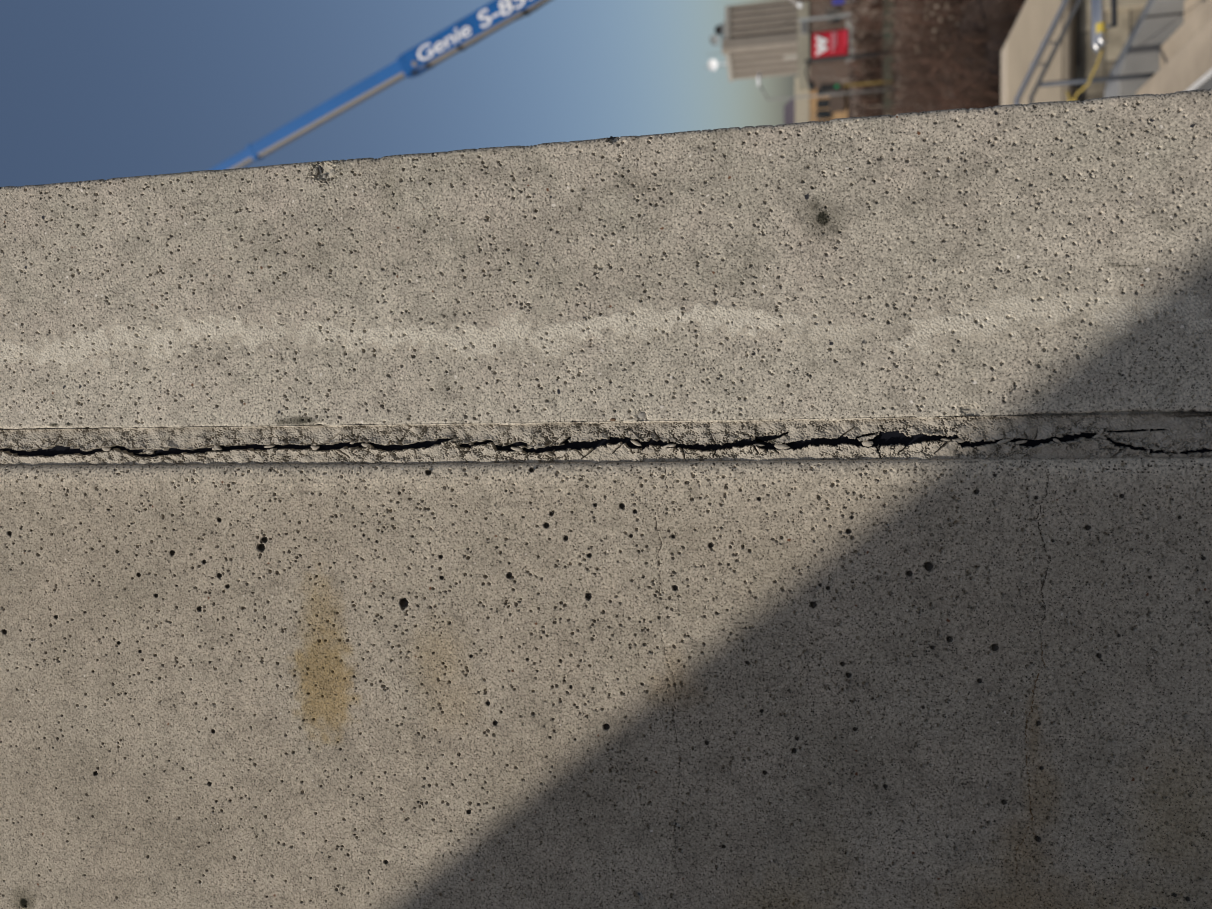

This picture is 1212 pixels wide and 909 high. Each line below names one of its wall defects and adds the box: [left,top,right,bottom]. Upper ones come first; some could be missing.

crack [0,429,1212,876]